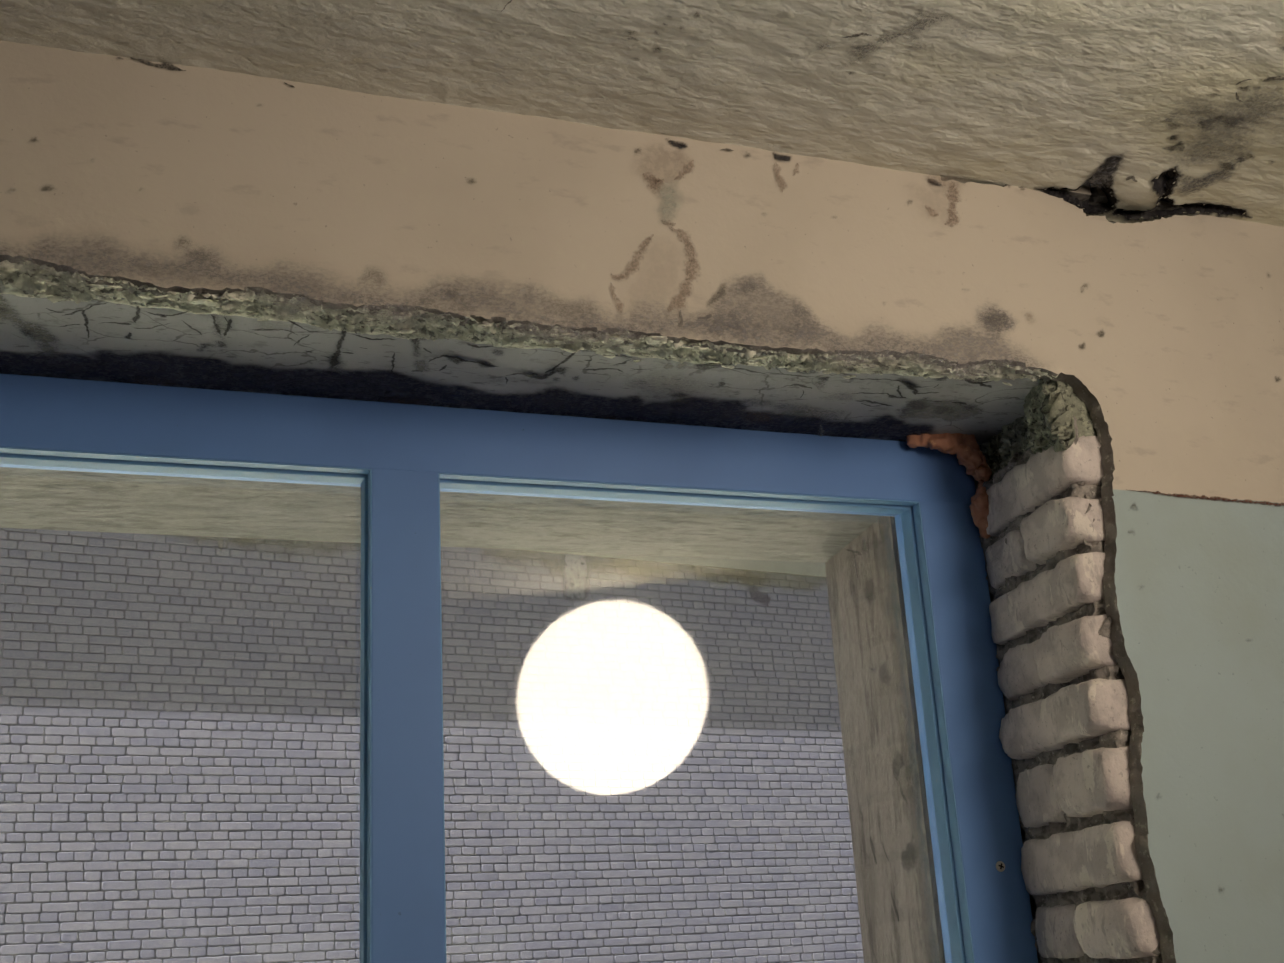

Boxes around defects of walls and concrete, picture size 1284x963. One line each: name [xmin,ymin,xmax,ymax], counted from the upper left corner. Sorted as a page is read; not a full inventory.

crack [1034,154,1252,221]
crack [46,302,395,375]
crack [429,344,644,384]
crack [766,372,994,407]
flaking render [0,260,1163,963]